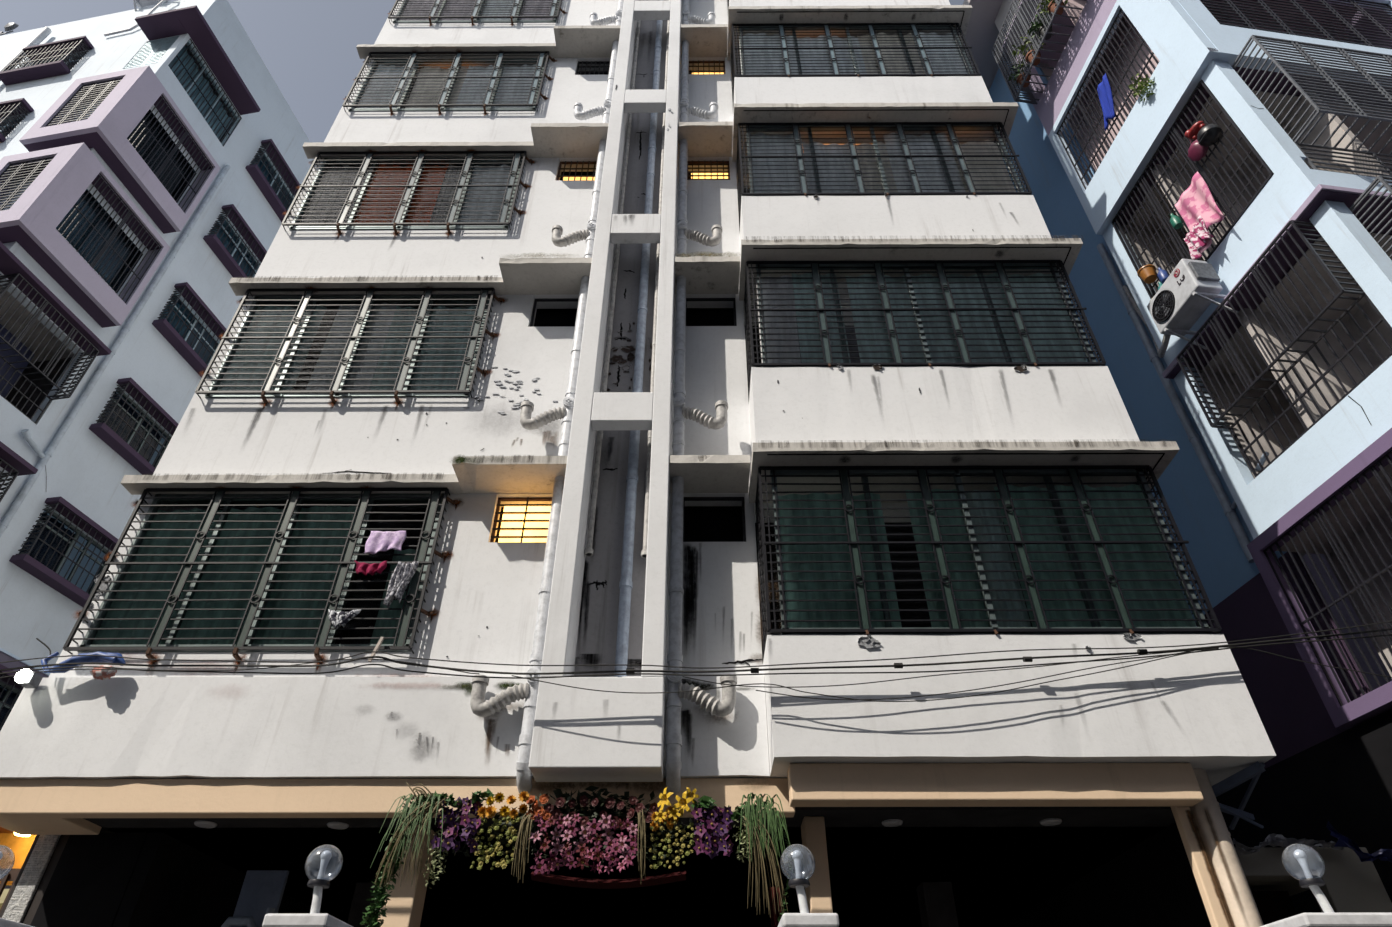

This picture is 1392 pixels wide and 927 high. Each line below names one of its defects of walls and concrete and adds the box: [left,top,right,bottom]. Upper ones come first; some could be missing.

peeling [463,367,557,415]
leakage [579,508,597,634]
leakage [684,545,701,635]
leakage [584,654,599,665]